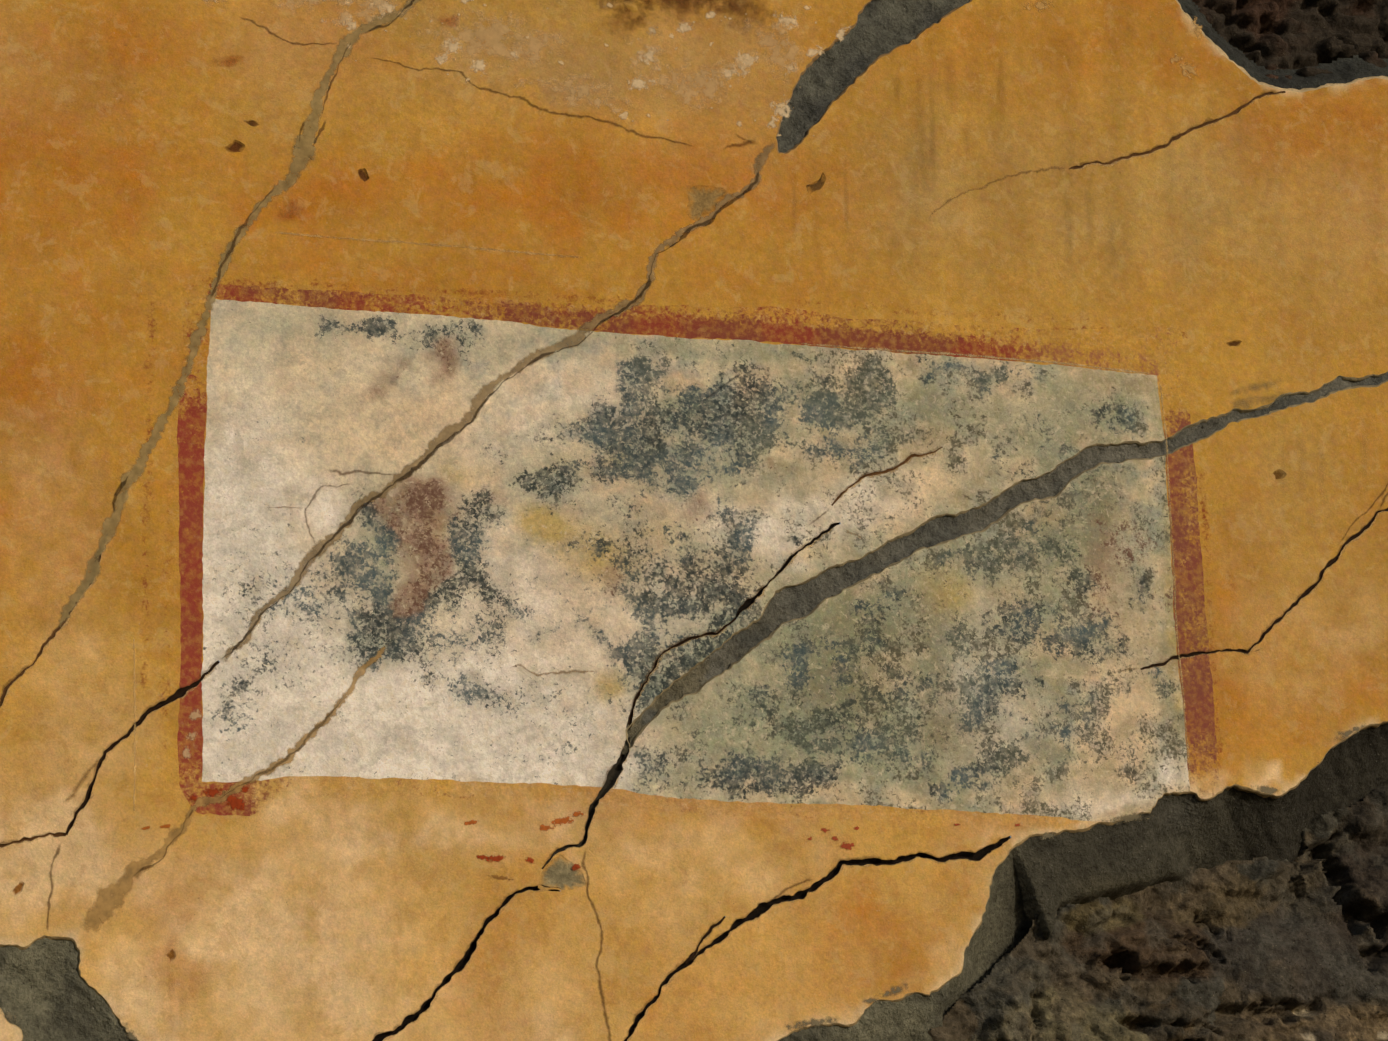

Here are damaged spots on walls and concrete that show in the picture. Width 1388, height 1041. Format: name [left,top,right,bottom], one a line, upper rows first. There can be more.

peeling [611,11,747,89]
peeling [702,52,758,87]
peeling [737,95,791,136]
crack [935,91,1285,211]
flaking render [1176,0,1388,93]
crack [0,0,972,930]
peeling [183,710,201,757]
crack [372,371,1388,1041]
peeling [12,881,25,897]
spalling [538,854,586,891]
flaking render [777,721,1388,1041]
flaking render [0,935,139,1041]